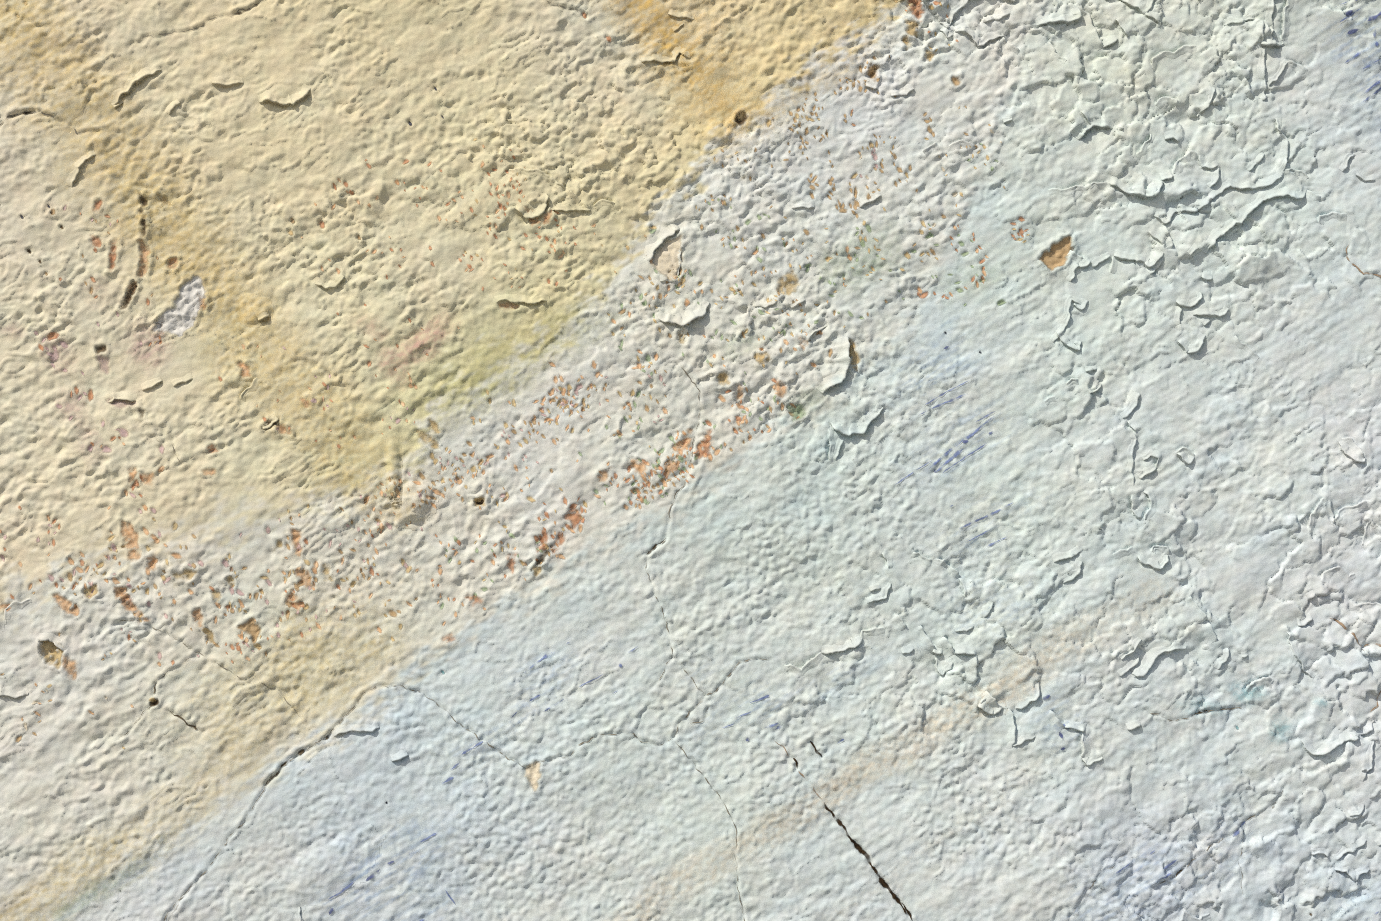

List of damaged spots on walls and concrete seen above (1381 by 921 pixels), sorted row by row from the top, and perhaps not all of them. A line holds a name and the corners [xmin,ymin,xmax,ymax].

peeling [894,0,1020,61]
peeling [1035,0,1163,51]
peeling [108,64,162,108]
peeling [257,83,311,105]
peeling [834,55,914,97]
peeling [1071,108,1124,140]
peeling [1040,117,1347,405]
peeling [0,92,988,663]
crack [119,368,767,921]
peeling [784,601,993,677]
peeling [1117,637,1186,677]
crack [775,741,912,920]